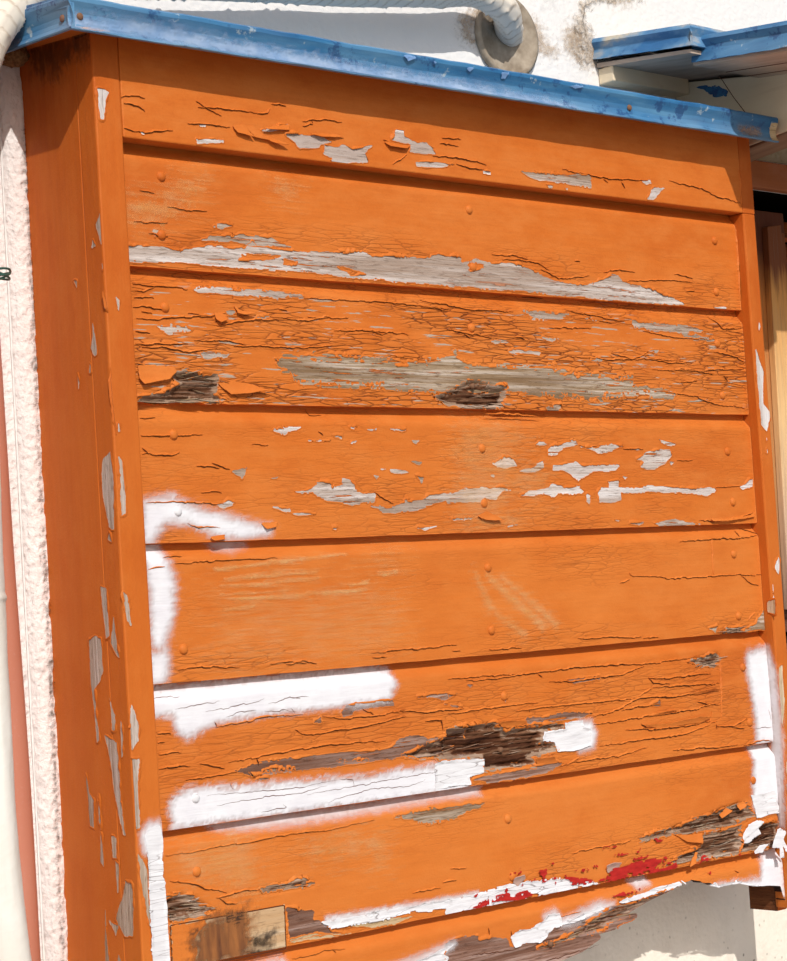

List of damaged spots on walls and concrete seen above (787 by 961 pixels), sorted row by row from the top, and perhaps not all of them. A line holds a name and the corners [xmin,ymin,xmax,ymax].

crack [573,0,615,66]